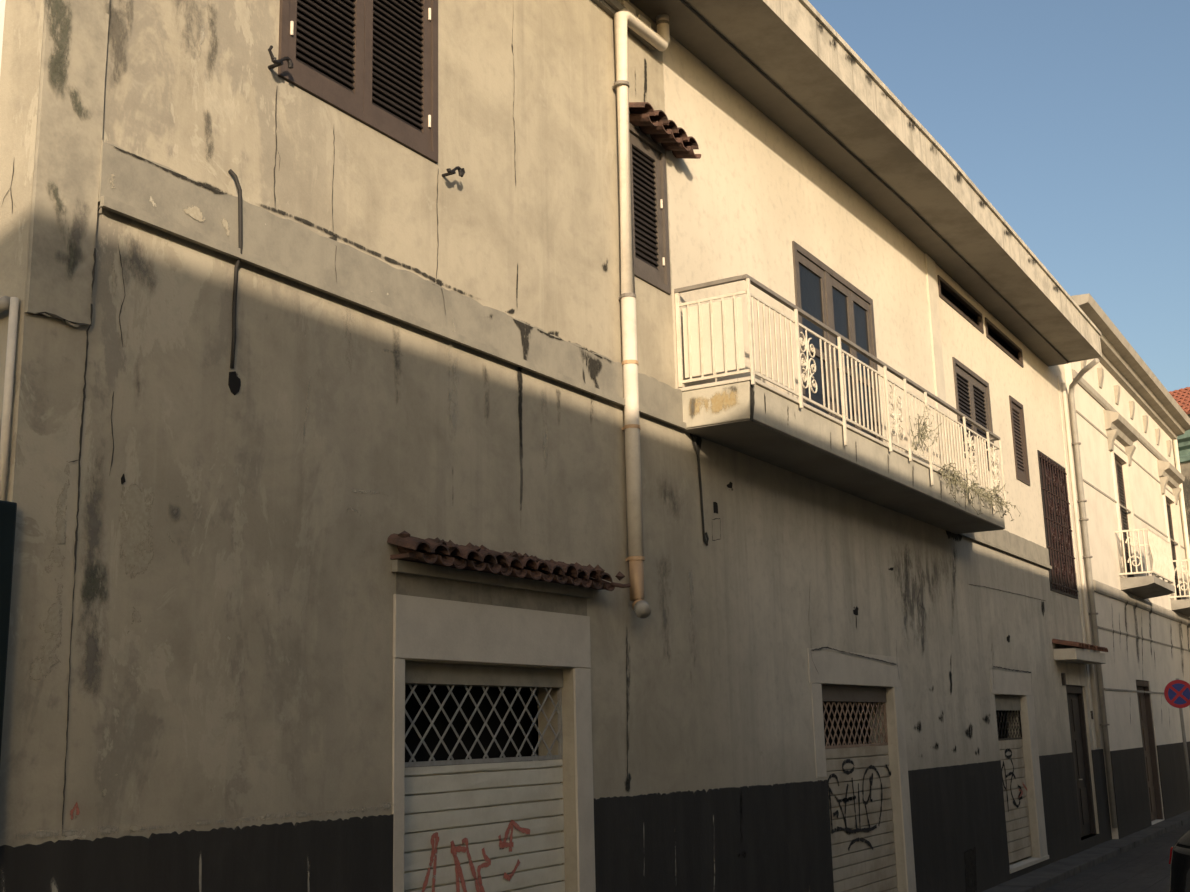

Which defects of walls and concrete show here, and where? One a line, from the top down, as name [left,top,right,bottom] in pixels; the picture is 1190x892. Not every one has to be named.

water stain [70,90,87,117]
crack [273,89,281,204]
crack [330,130,338,282]
water stain [507,264,610,510]
water stain [1181,476,1190,534]
water stain [896,553,938,652]